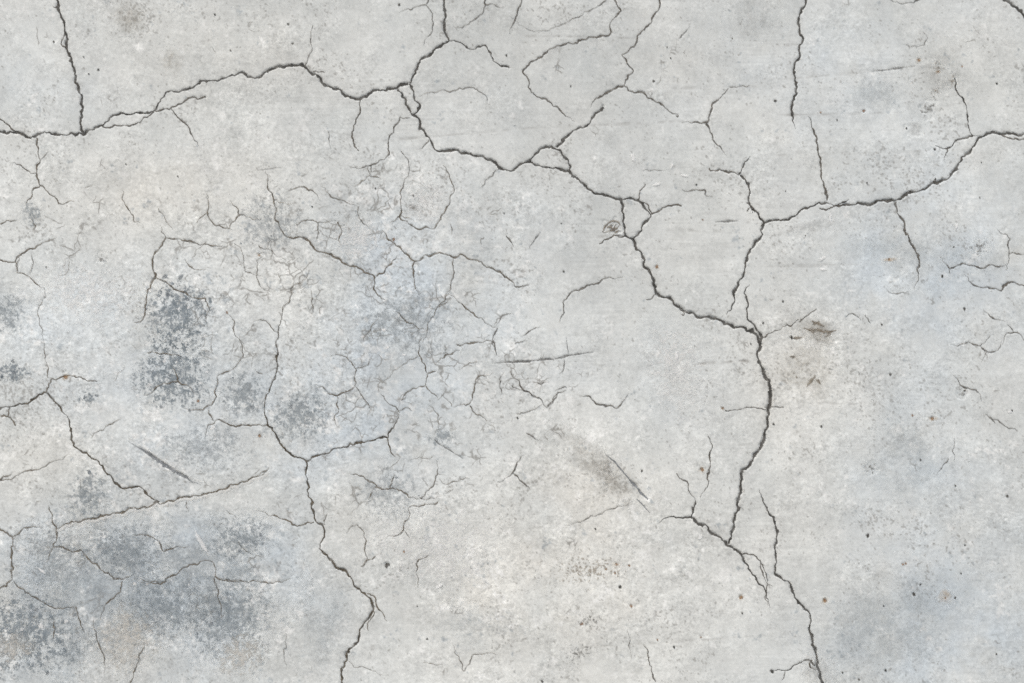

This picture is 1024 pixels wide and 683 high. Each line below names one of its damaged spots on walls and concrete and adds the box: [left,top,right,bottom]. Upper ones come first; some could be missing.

crack [1003,0,1024,17]
crack [0,351,286,668]
crack [184,170,526,683]
crack [0,0,816,605]
crack [759,490,824,683]
crack [709,78,1024,312]
crack [944,230,1024,353]
crack [957,378,1017,431]